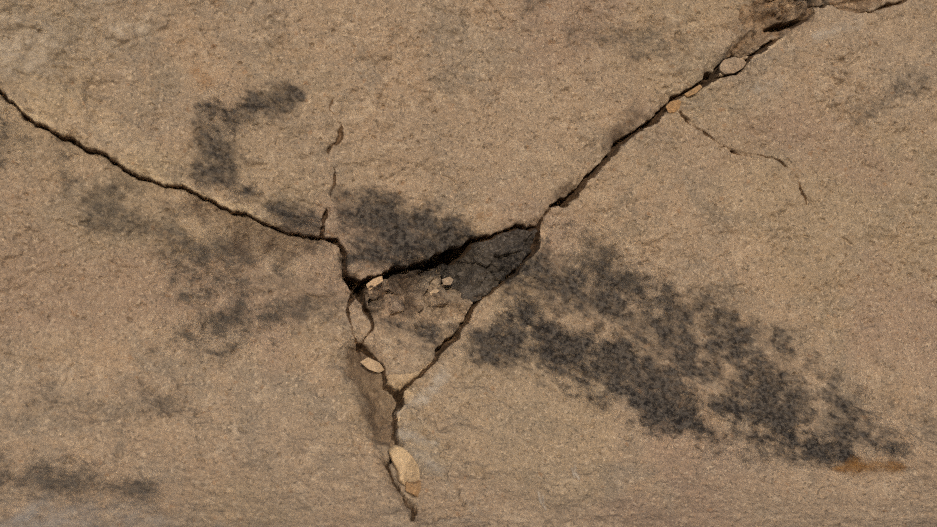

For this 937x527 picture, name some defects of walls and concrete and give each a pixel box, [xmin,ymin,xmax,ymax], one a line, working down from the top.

crack [856,0,907,13]
crack [0,0,837,445]
damp [470,309,714,442]
damp [733,419,853,464]
crack [385,460,418,522]